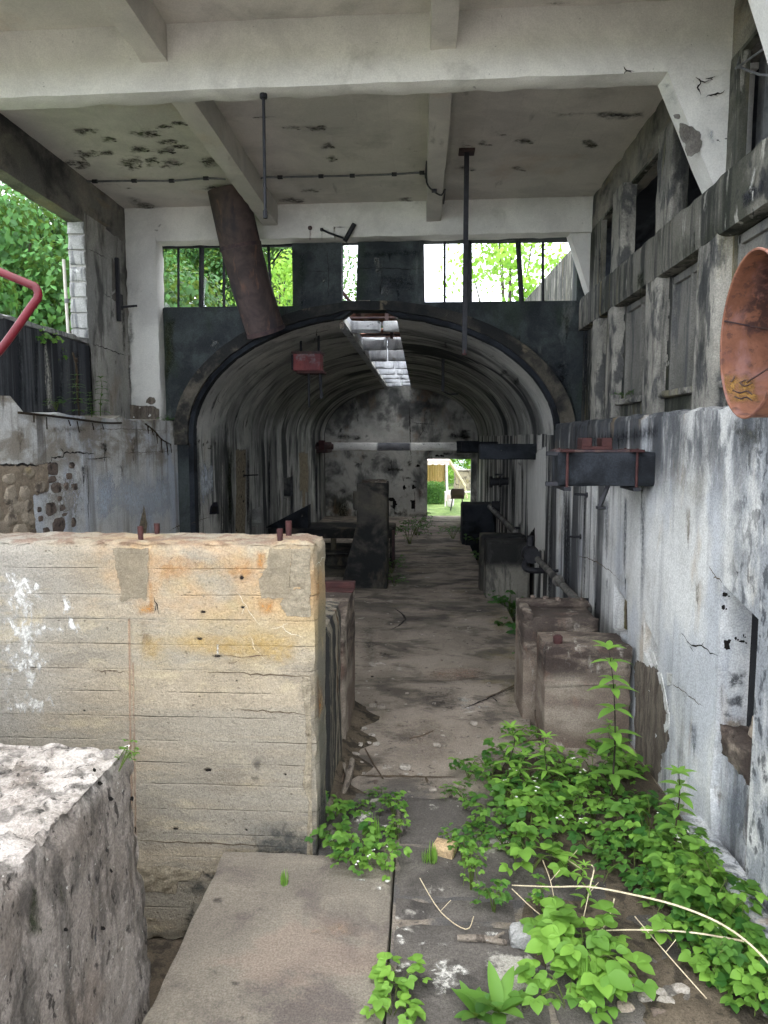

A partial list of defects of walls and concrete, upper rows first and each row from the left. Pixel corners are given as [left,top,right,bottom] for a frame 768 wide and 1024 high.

crack [696,76,724,96]
leakage [65,137,116,169]
leakage [123,122,188,169]
peeling [673,114,702,156]
flaking render [0,462,79,534]
leakage [4,573,78,712]
leakage [726,674,743,727]